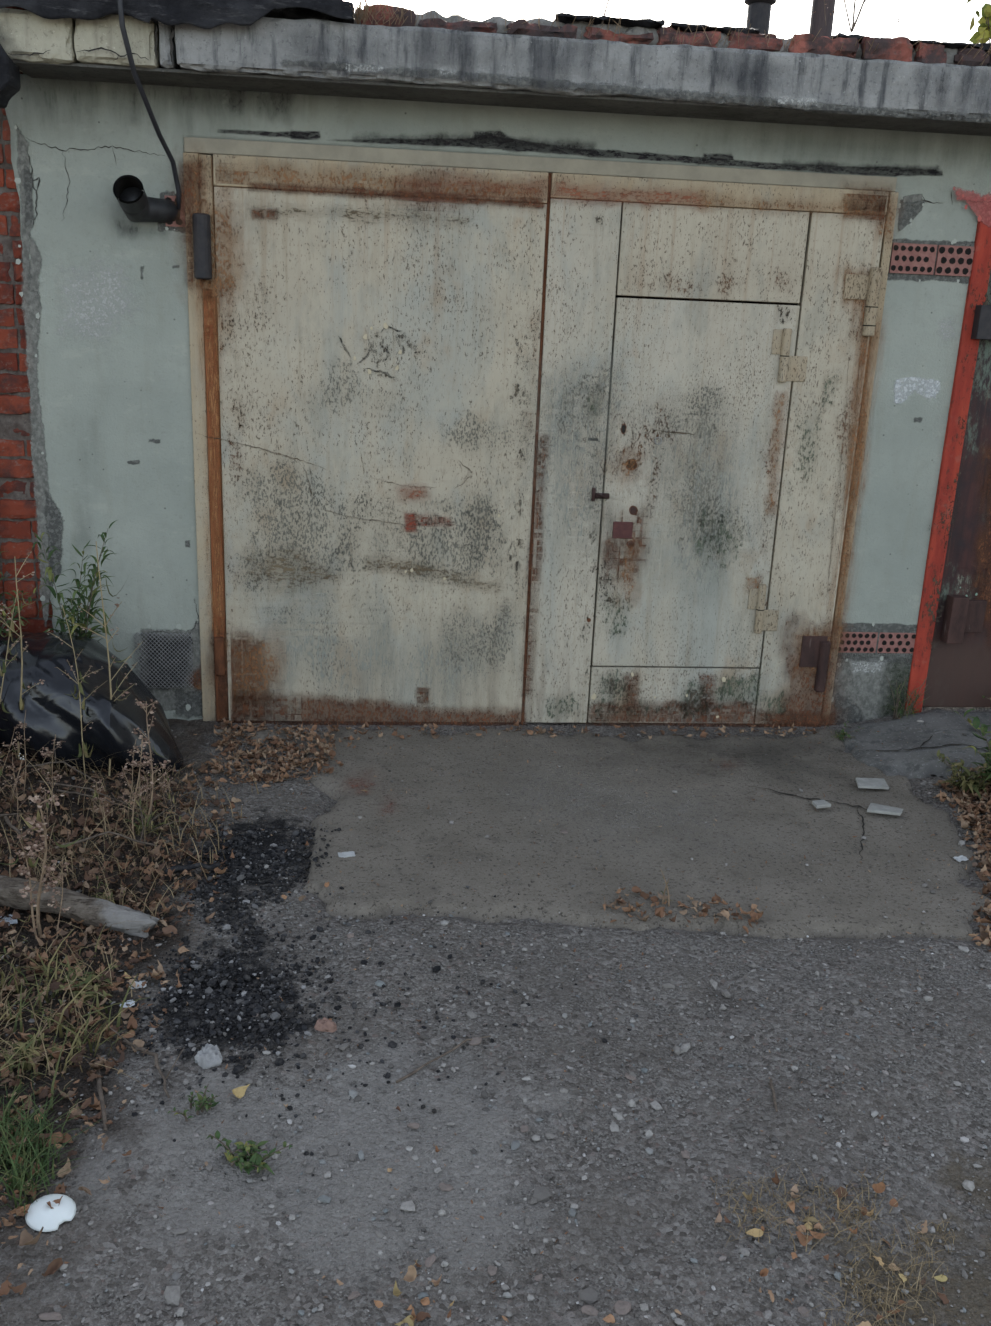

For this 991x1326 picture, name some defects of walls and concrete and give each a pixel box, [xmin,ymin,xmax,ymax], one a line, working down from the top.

crack [33,141,164,216]
rust [744,187,896,239]
spalling [887,194,991,314]
peeling [953,187,991,227]
spalling [14,125,63,626]
rust [180,162,725,726]
rust [588,299,880,728]